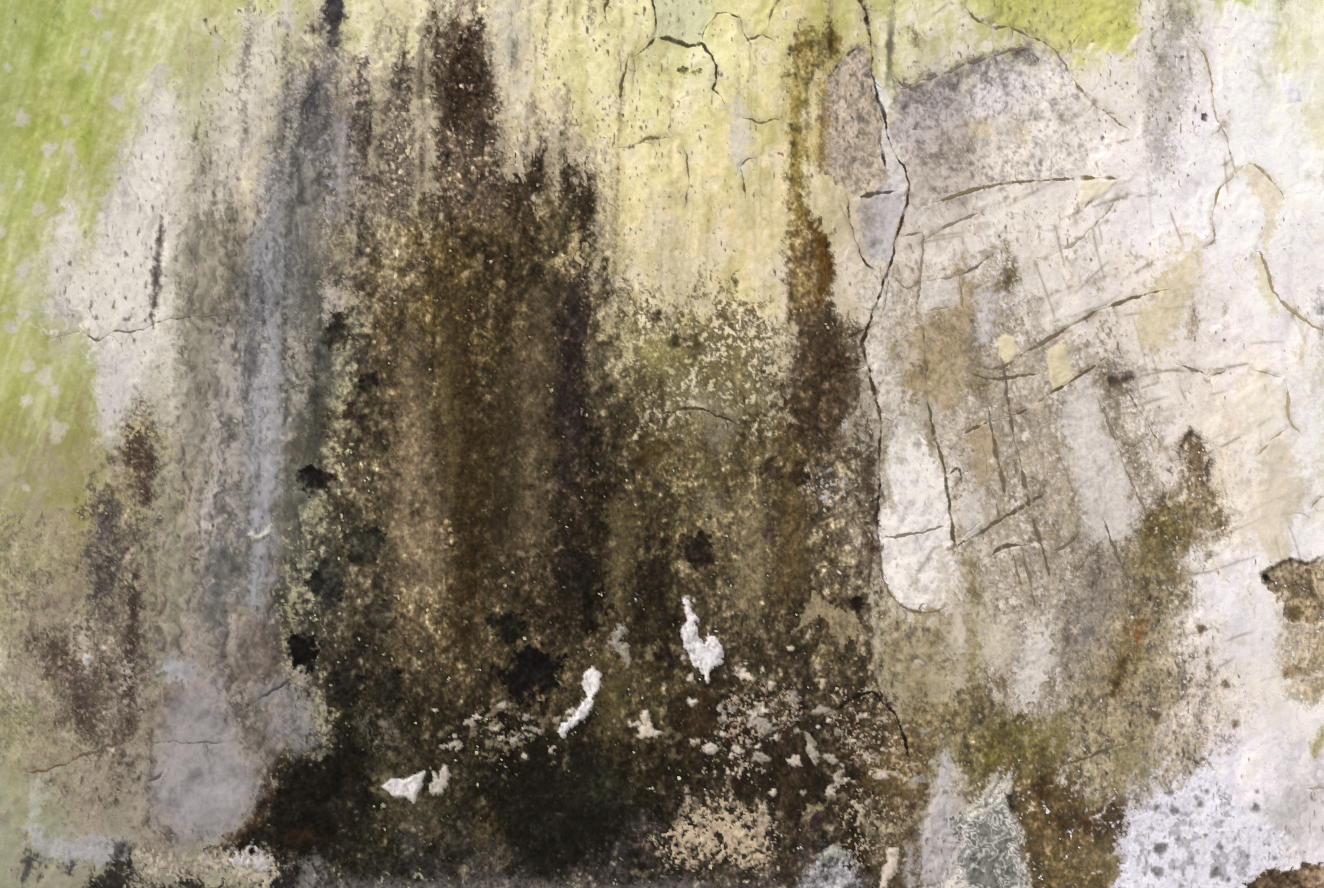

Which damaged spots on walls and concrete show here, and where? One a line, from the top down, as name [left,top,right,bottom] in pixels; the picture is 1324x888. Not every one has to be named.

water stain [538,0,554,61]
water stain [676,65,704,79]
crack [619,0,779,97]
crack [640,136,689,200]
crack [1210,186,1221,244]
crack [1200,50,1283,195]
crack [835,0,1083,613]
crack [1259,251,1322,329]
peeling [810,0,1143,718]
peeling [1046,342,1235,568]
spalling [1258,554,1324,702]
water stain [727,709,753,743]